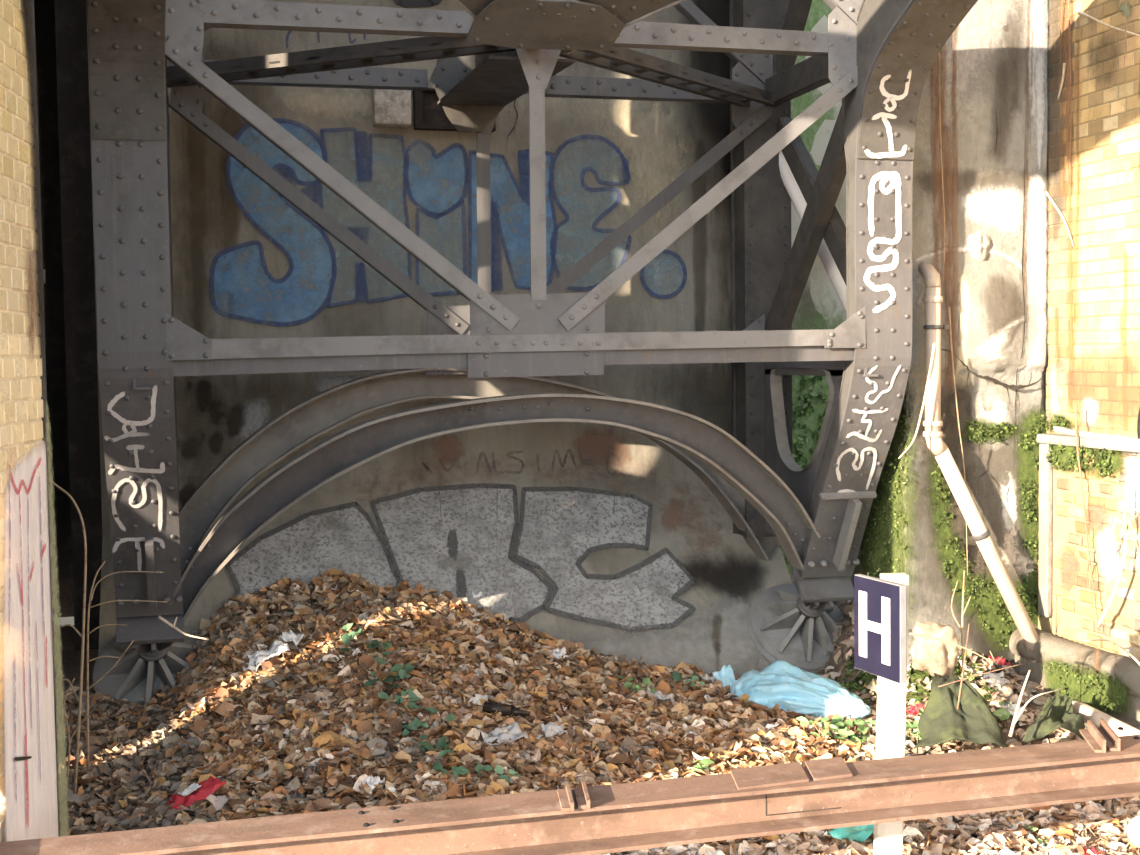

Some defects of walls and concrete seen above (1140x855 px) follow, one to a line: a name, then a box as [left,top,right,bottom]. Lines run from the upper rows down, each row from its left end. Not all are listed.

rust [931,31,959,387]
damp [916,0,1064,411]
damp [181,378,352,492]
damp [932,454,955,505]
damp [941,276,970,442]
crack [941,165,1051,516]
damp [1054,359,1140,444]
damp [1126,458,1140,514]
damp [953,525,978,564]
damp [950,578,1009,663]